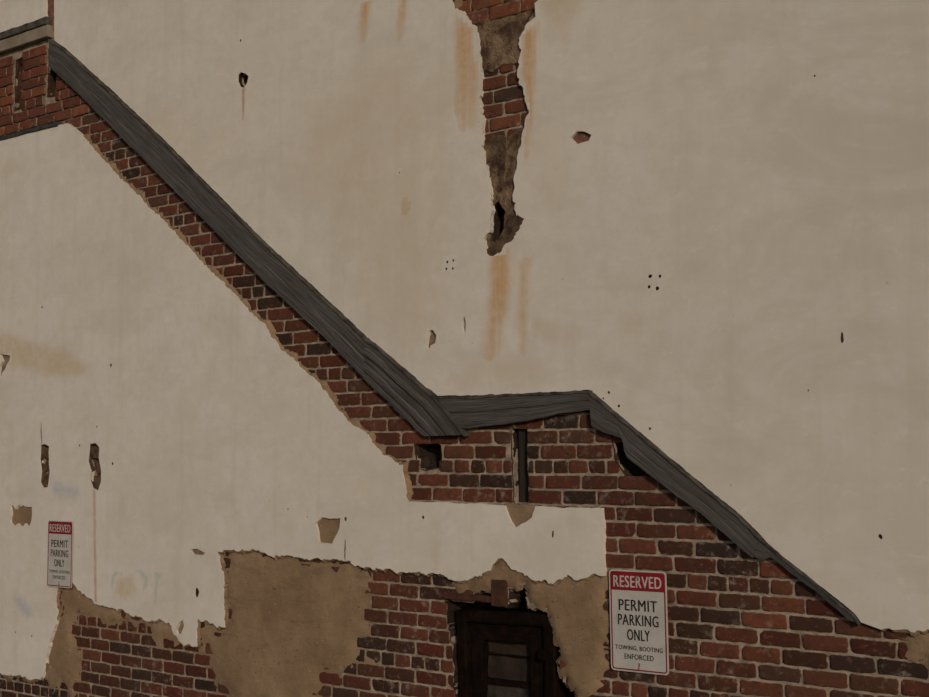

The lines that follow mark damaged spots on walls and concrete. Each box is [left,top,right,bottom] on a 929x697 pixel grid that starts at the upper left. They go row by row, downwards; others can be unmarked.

spalling [454,0,536,256]
spalling [572,132,591,144]
corrosion [473,241,536,361]
spalling [12,506,32,526]
spalling [317,518,340,544]
spalling [506,503,539,527]
spalling [0,549,618,697]
spalling [880,628,929,671]